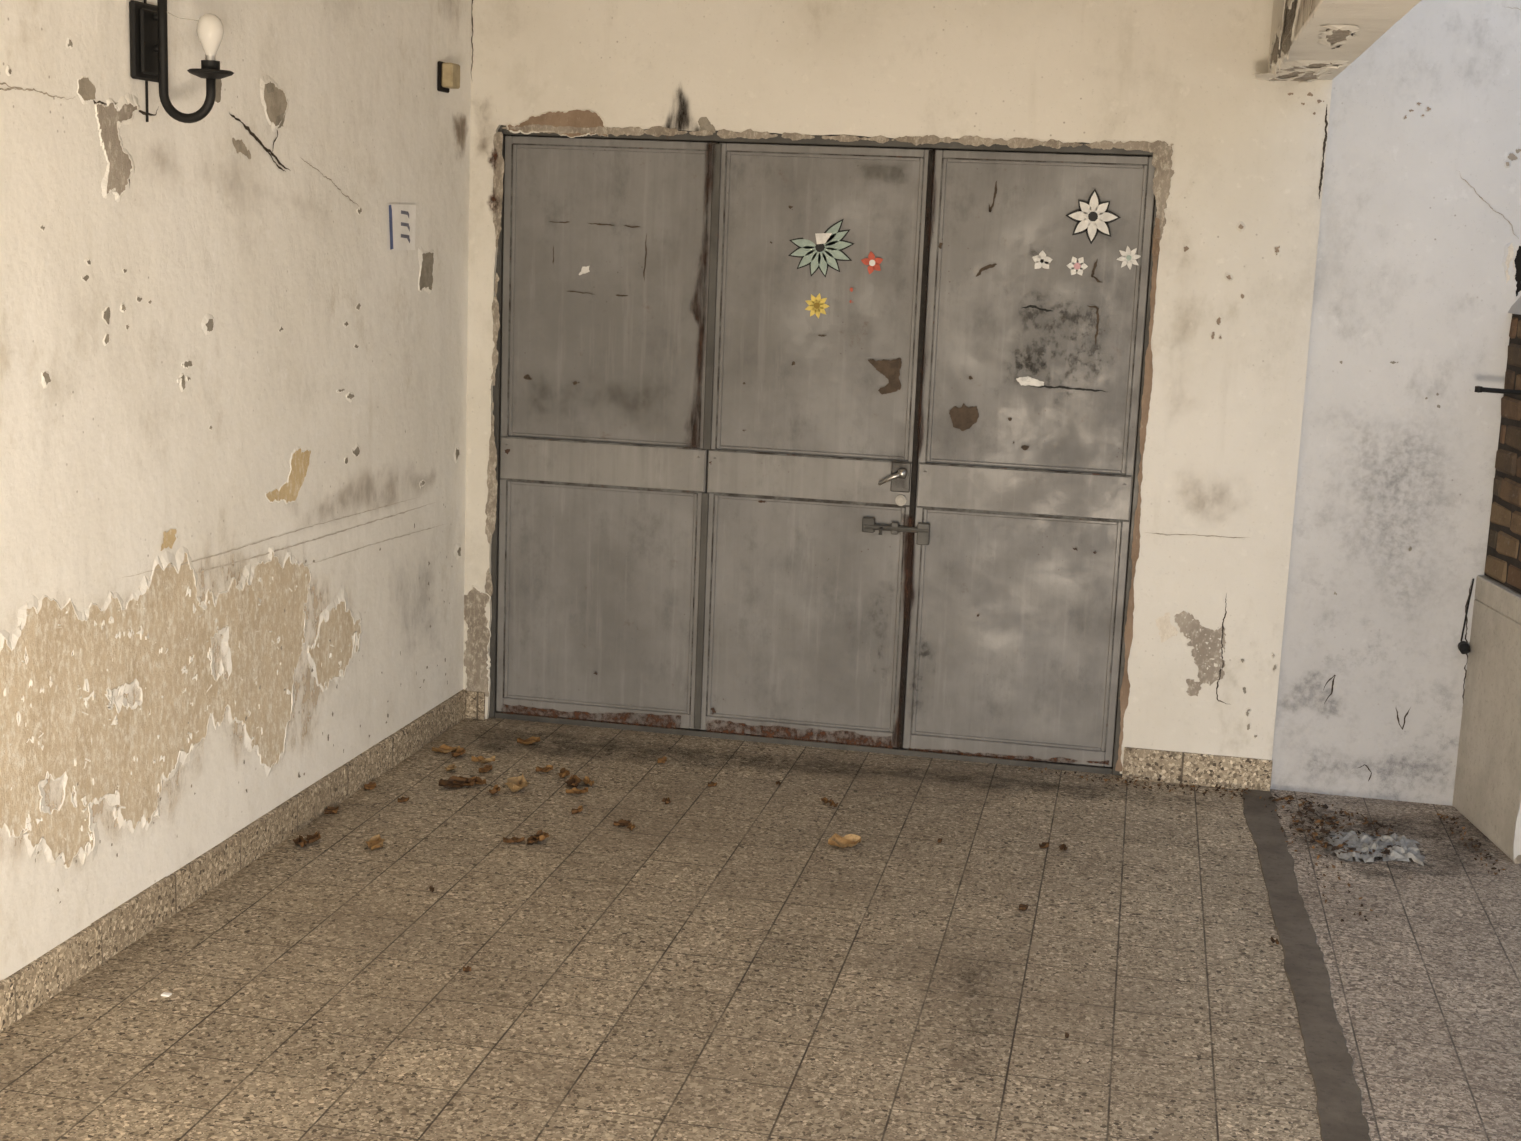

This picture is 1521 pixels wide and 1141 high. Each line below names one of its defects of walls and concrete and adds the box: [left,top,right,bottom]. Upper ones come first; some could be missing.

crack [0,82,73,99]
spalling [77,76,159,202]
crack [229,113,358,205]
spalling [1253,0,1360,199]
crack [1461,178,1519,239]
spalling [493,109,1174,772]
corrosion [904,516,914,621]
peeling [0,529,362,869]
spalling [416,569,493,697]
corrosion [504,705,681,729]
corrosion [706,697,1109,765]
peeling [1156,594,1245,704]